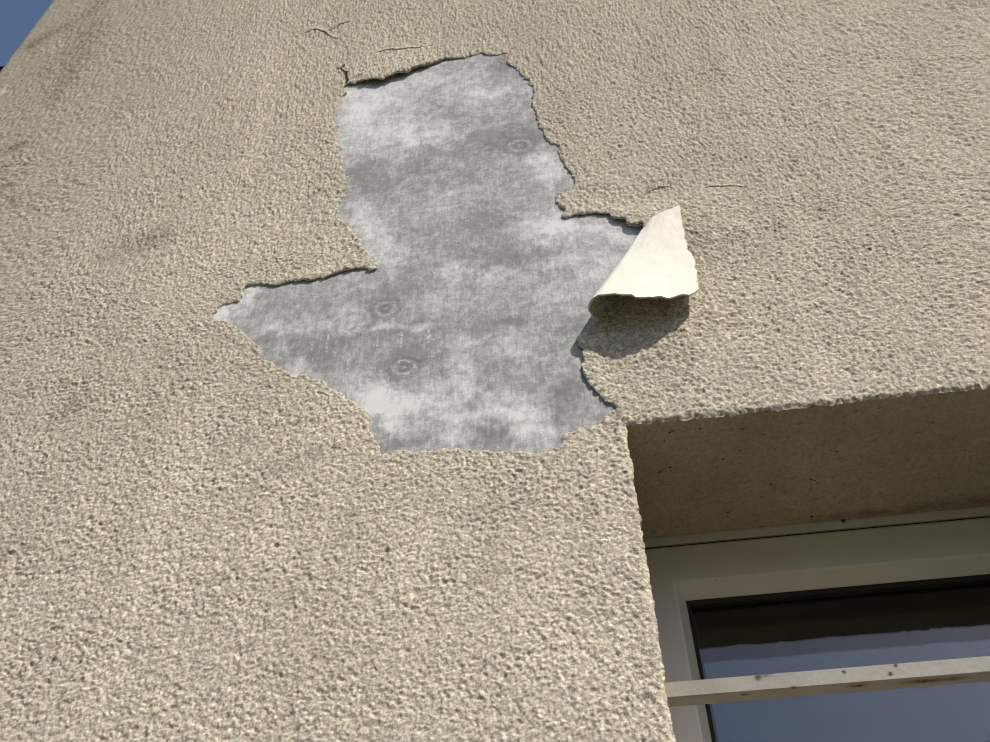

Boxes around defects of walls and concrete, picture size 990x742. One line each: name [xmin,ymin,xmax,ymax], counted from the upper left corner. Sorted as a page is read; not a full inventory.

crack [300,17,435,82]
peeling [212,52,699,454]